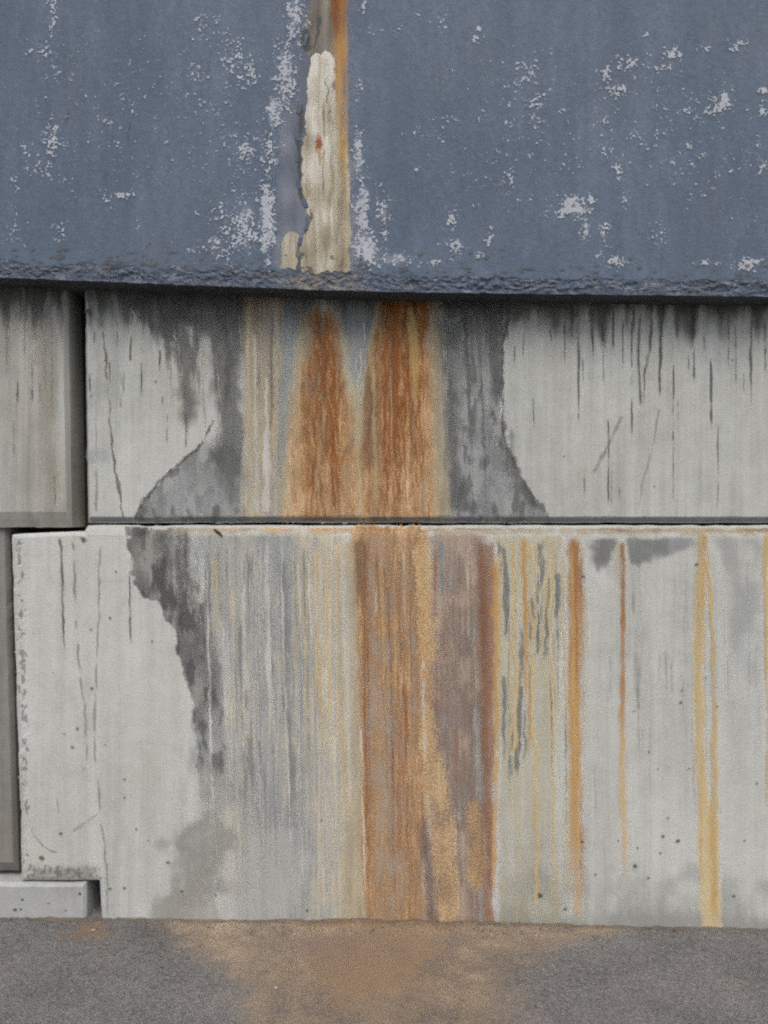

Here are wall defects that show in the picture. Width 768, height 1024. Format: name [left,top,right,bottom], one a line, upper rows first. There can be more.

rust [331,0,347,111]
spalling [0,0,768,297]
crack [102,323,124,517]
rust [266,301,499,923]
leakage [117,291,768,1024]
rust [569,539,582,876]
rust [695,535,722,928]